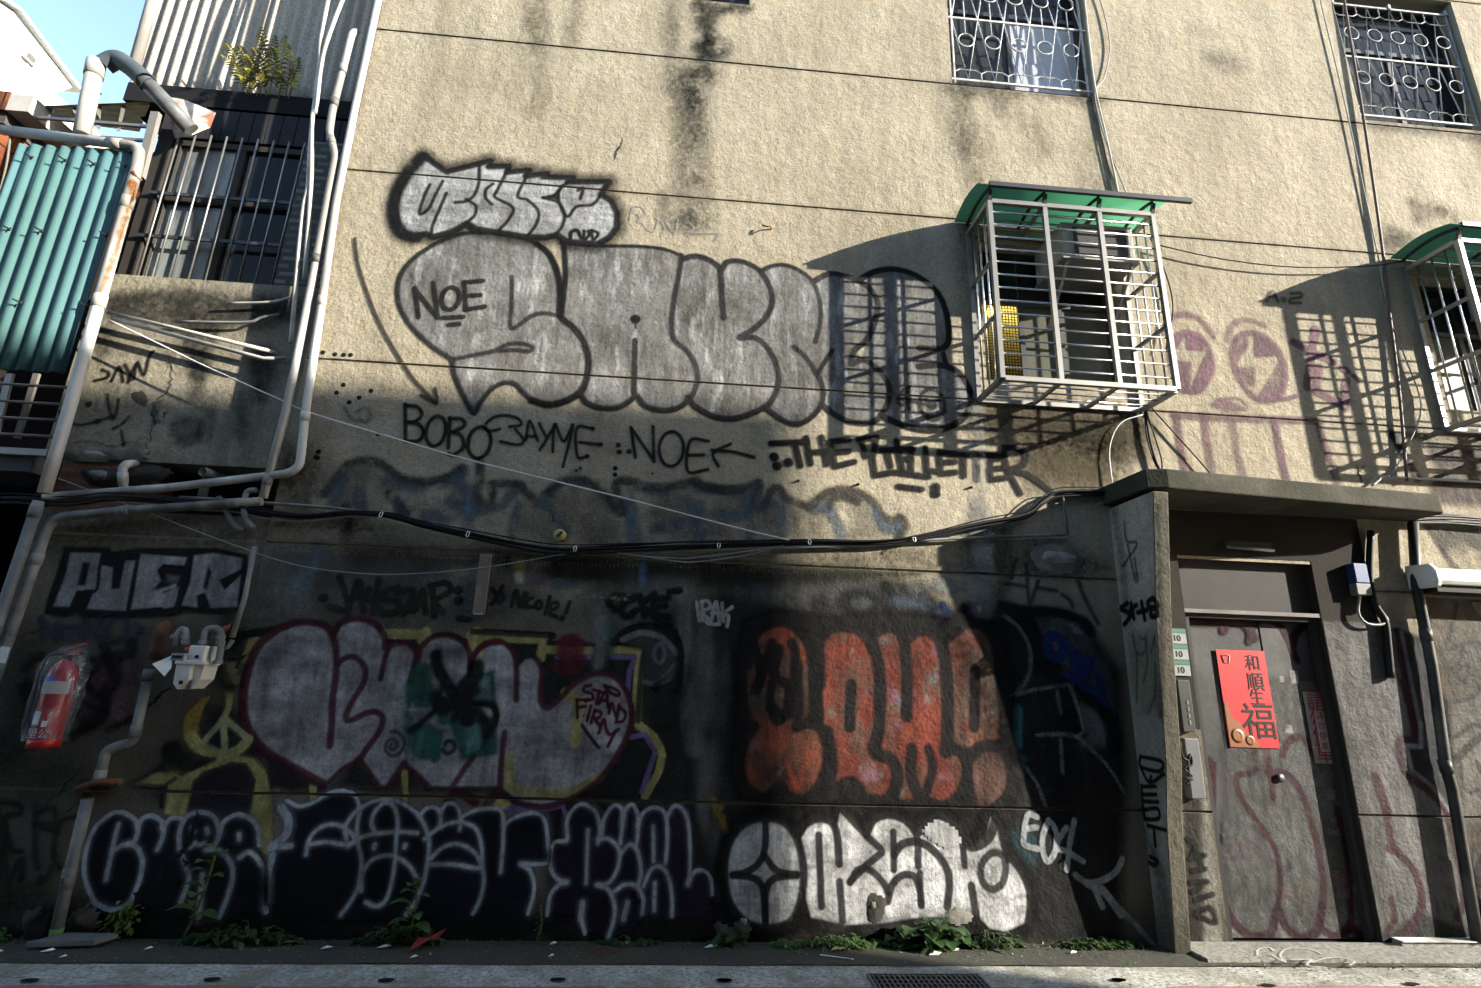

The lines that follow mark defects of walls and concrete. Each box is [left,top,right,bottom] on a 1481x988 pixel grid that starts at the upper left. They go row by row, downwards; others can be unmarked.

water stain [667,0,752,153]